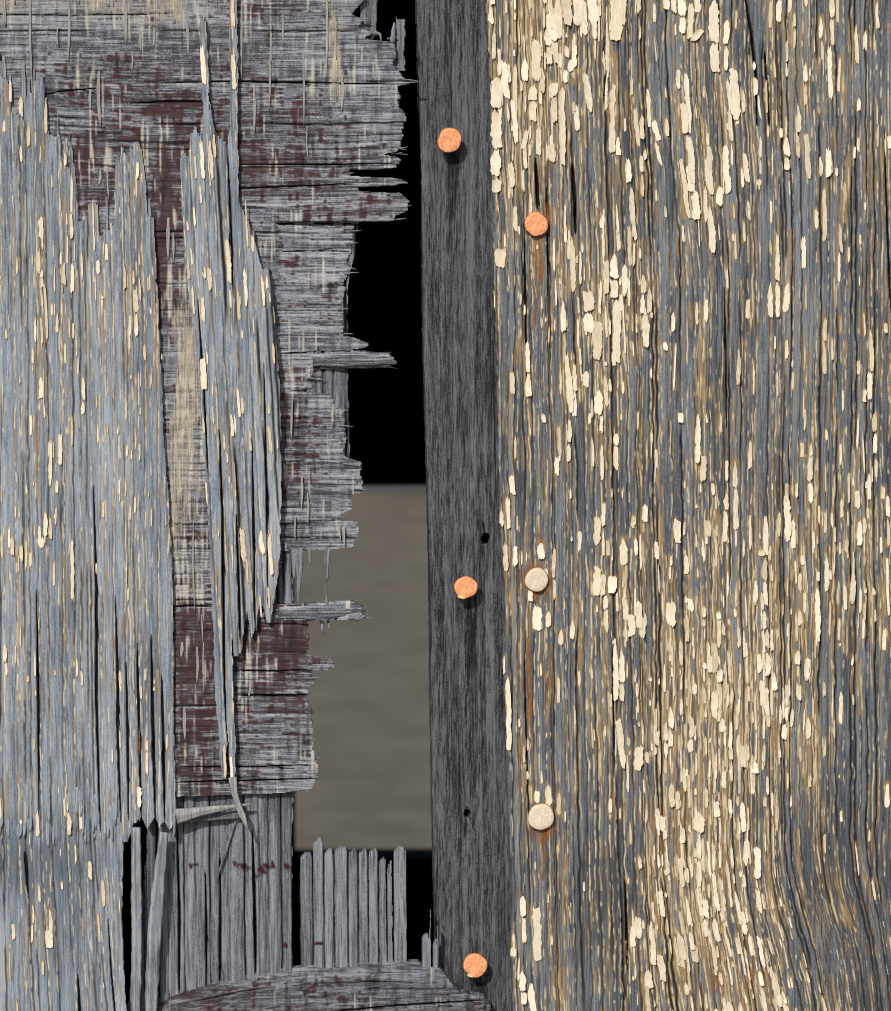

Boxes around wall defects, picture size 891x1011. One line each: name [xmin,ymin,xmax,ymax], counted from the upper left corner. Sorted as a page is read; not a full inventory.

peeling [653,0,861,281]
peeling [25,154,108,493]
corrosion [533,209,551,333]
peeling [488,0,669,480]
peeling [767,201,790,318]
peeling [857,313,874,402]
peeling [503,543,565,609]
peeling [528,589,575,645]
peeling [503,656,520,751]
peeling [571,413,890,1011]
crack [337,1000,474,1011]
peeling [510,894,553,1011]